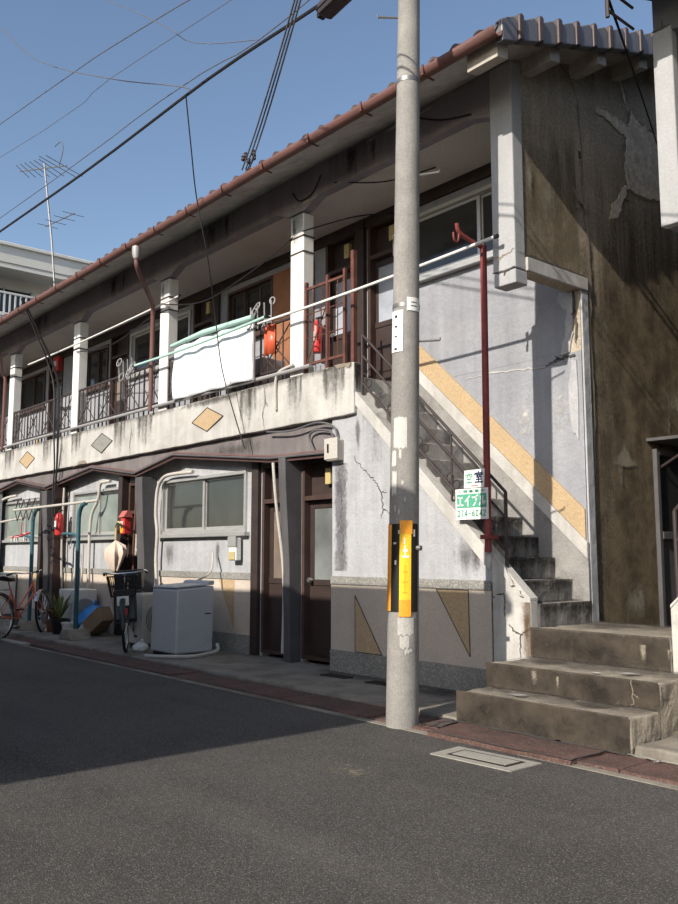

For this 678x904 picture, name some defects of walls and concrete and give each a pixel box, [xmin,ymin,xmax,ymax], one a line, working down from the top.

flaking render [595,82,660,219]
crack [466,63,596,491]
crack [354,456,388,517]
damp [456,130,678,756]
crack [491,583,526,662]